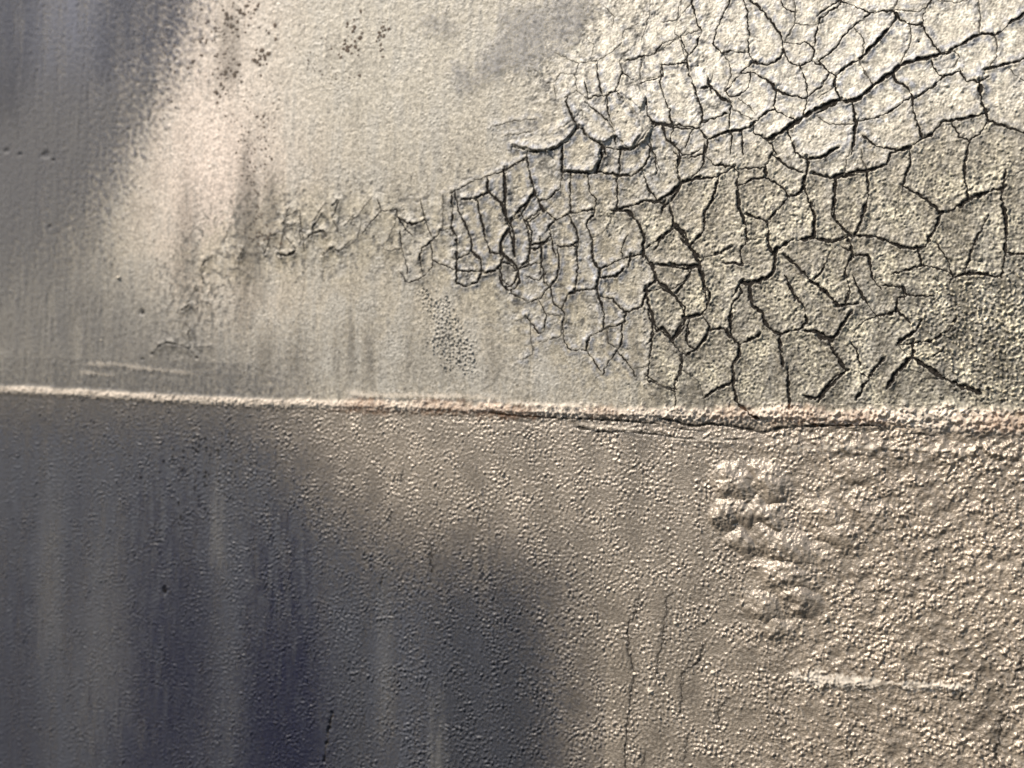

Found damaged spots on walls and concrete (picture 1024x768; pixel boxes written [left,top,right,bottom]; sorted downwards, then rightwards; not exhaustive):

leakage [0,0,572,768]
crack [154,0,1024,441]